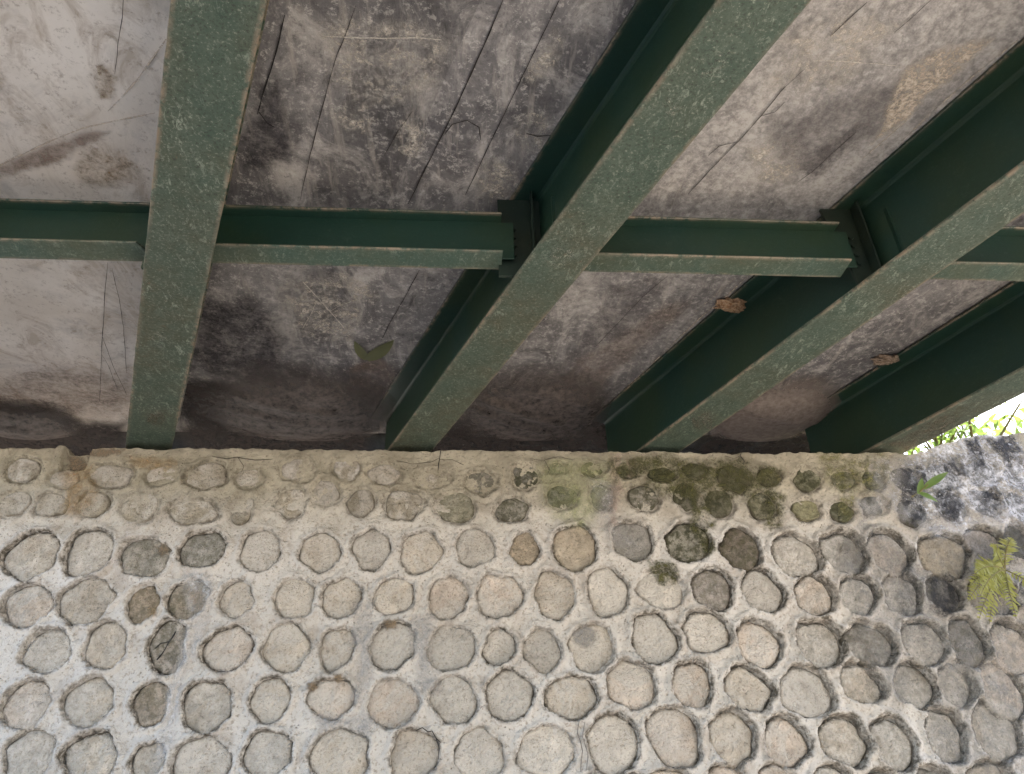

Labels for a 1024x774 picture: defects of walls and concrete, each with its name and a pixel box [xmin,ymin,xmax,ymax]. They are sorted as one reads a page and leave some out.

crack [257,15,285,127]
crack [300,6,356,199]
crack [408,0,559,204]
crack [689,71,802,193]
crack [99,263,128,402]
water stain [690,501,715,531]
water stain [765,492,786,529]